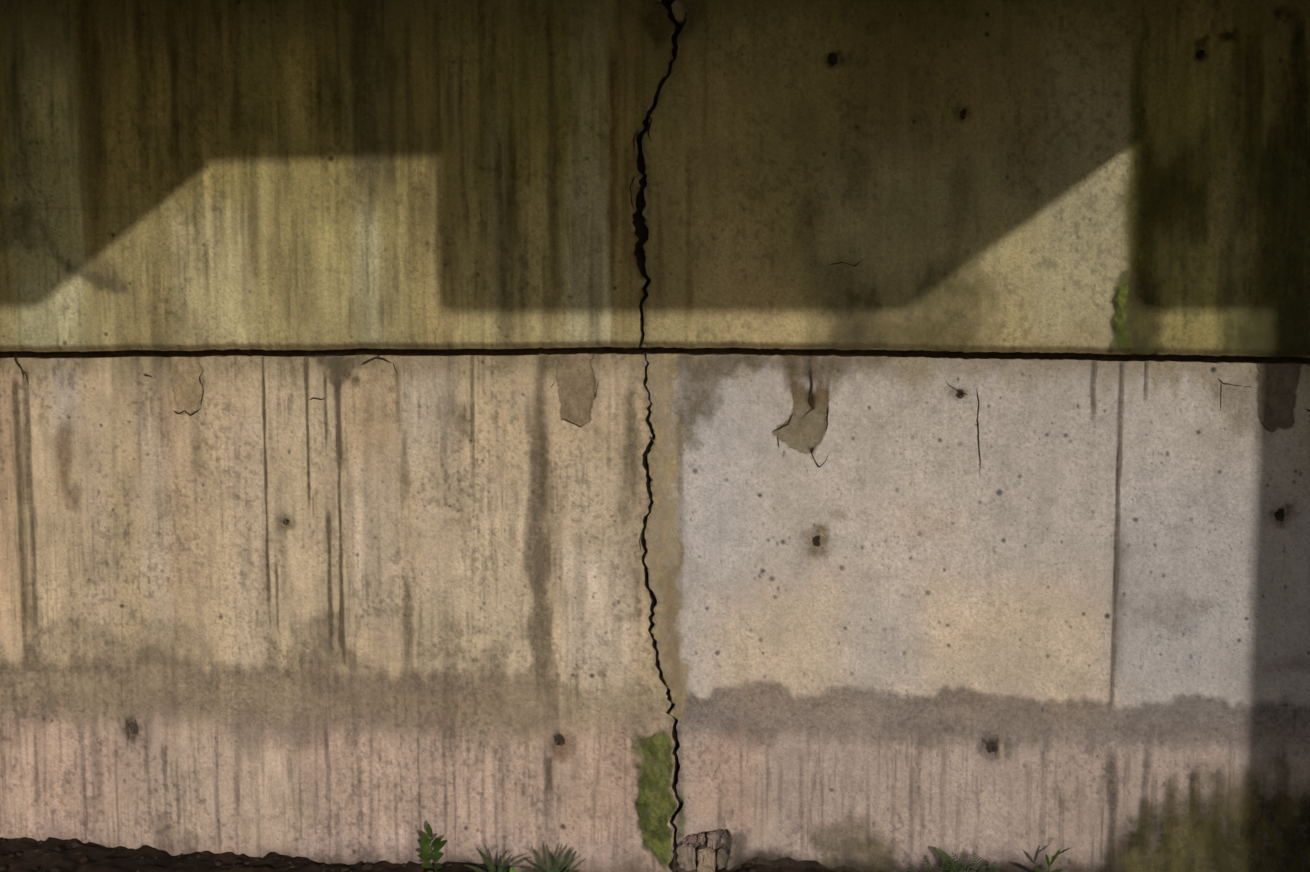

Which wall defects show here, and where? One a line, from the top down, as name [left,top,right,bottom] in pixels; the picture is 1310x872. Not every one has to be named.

peeling [170,357,204,416]
peeling [547,354,599,427]
crack [629,0,687,872]
peeling [772,356,830,467]
peeling [1257,363,1301,432]
leakage [625,354,797,730]
leakage [882,362,1310,741]
leakage [740,852,800,869]
leakage [1100,761,1117,872]